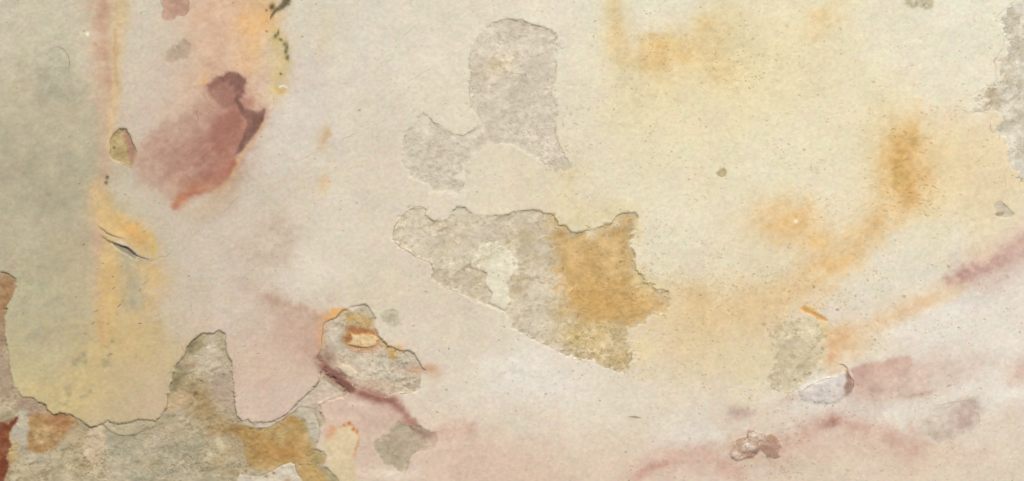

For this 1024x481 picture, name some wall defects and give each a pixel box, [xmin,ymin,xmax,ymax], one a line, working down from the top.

flaking render [109,128,137,168]
leakage [131,0,293,224]
peeling [0,271,435,481]
peeling [391,18,693,378]
leakage [597,158,1024,481]
rust [736,94,962,340]
peeling [955,0,1024,230]